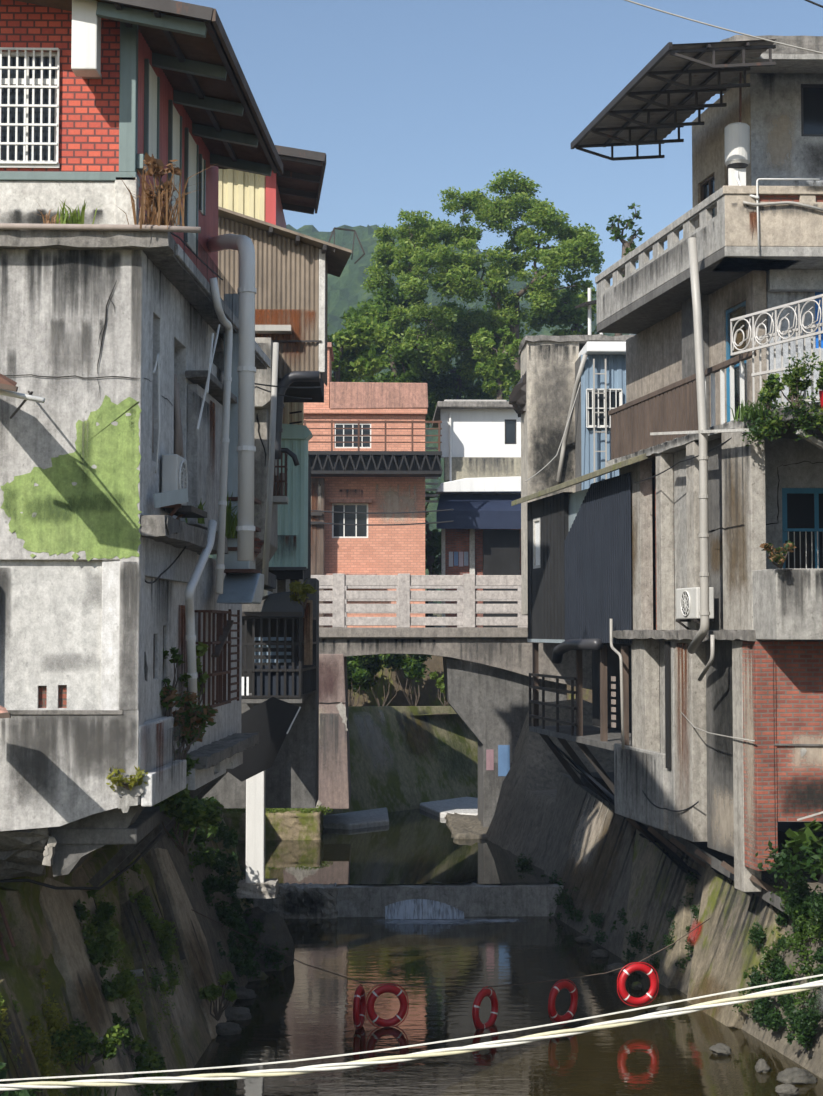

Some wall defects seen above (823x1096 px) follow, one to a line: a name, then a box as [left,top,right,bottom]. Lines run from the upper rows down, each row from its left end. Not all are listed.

water stain [795,148,823,191]
water stain [26,249,164,311]
crack [4,280,173,406]
rust [255,309,315,346]
crack [709,461,823,543]